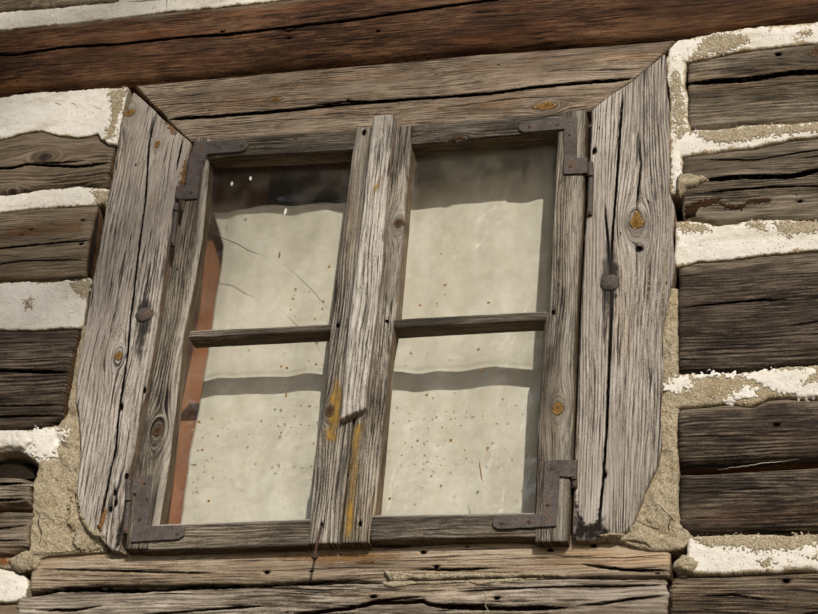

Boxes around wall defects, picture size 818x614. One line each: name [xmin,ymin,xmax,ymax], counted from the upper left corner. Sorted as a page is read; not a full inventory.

crack [0,0,499,56]
crack [0,135,127,295]
crack [100,78,654,532]
crack [0,404,56,417]
crack [0,358,66,374]
peeling [663,367,818,406]
spalling [0,460,35,480]
peeling [29,425,70,461]
crack [0,482,336,614]
crack [293,557,673,614]